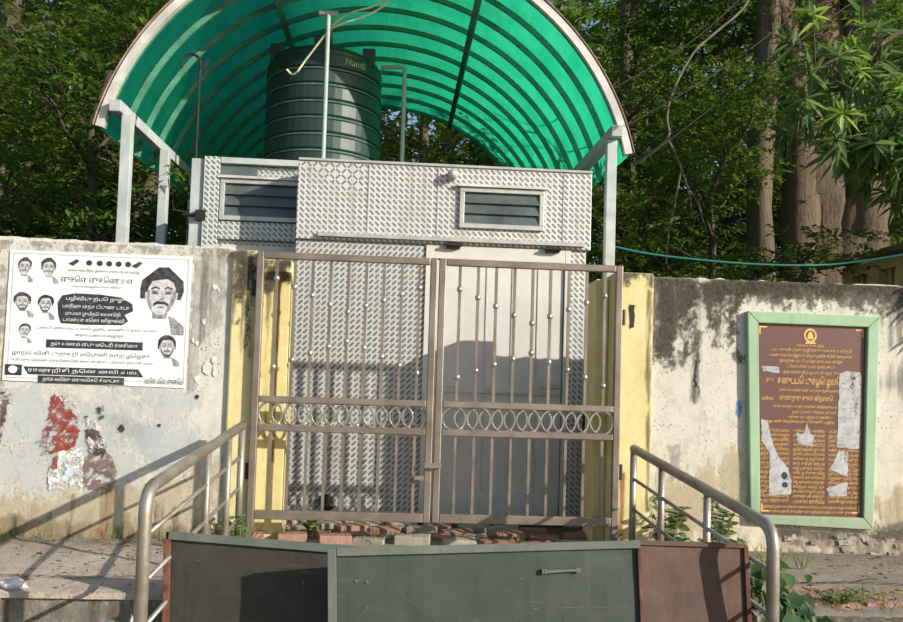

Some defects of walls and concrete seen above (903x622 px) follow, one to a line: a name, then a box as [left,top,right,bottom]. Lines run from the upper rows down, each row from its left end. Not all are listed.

water stain [232,250,292,405]
crack [692,331,702,403]
water stain [623,272,903,373]